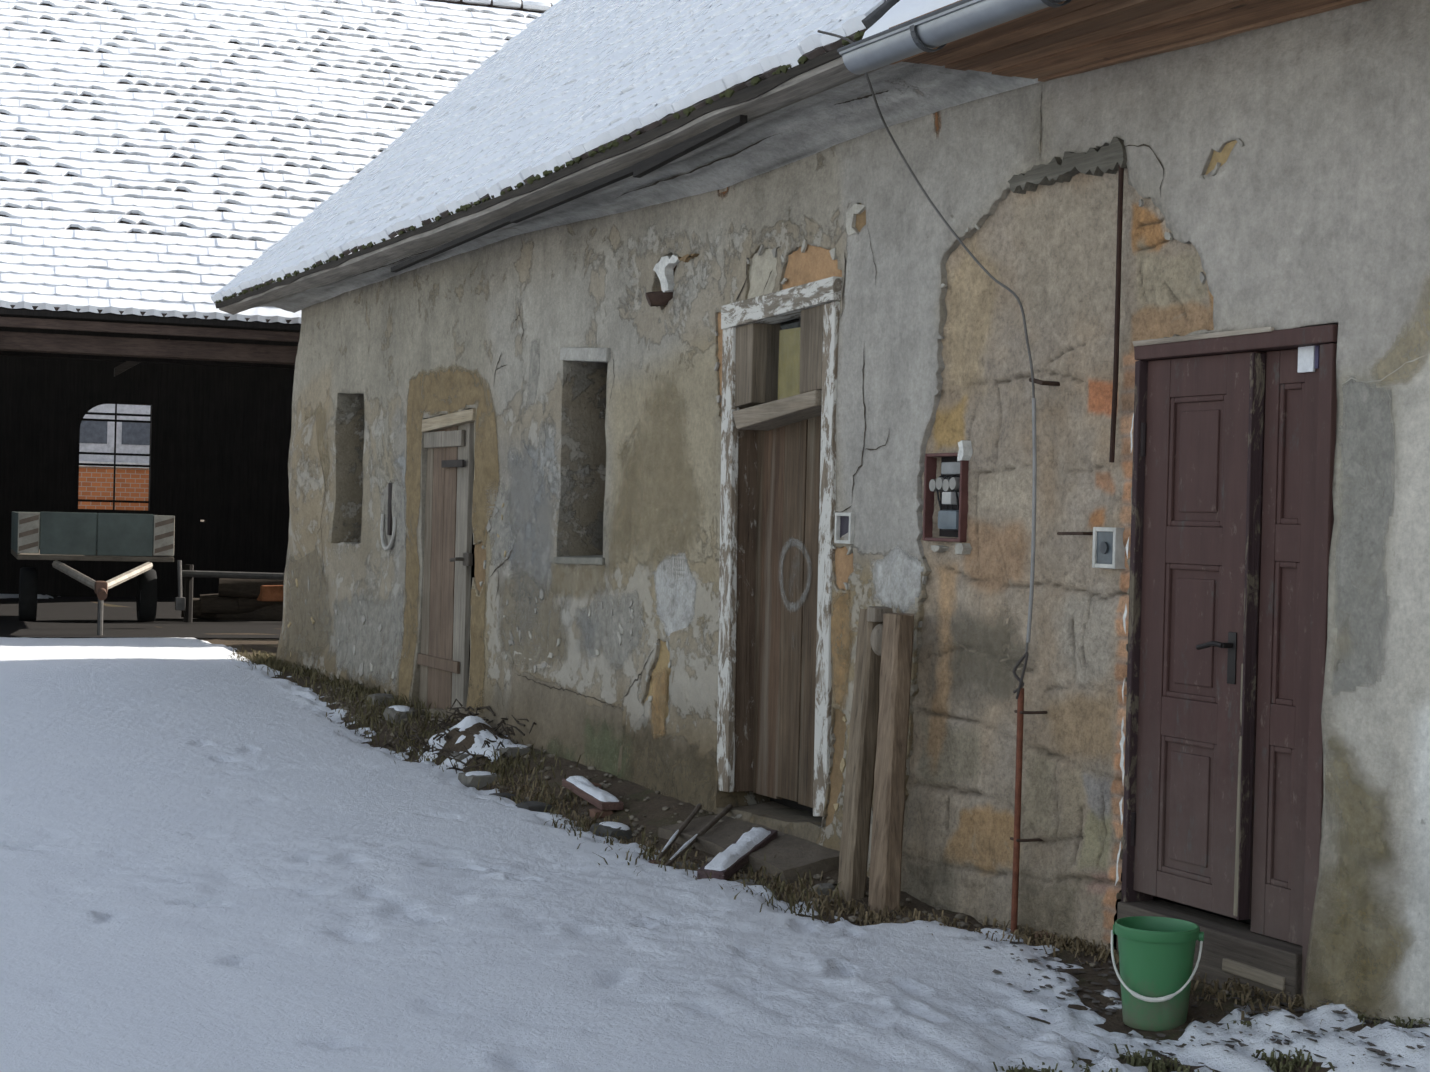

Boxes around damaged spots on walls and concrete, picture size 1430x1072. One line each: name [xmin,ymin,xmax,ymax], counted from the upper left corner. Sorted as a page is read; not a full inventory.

crack [1124,144,1164,197]
flaking render [1199,139,1245,179]
flaking render [846,203,866,236]
flaking render [747,239,842,299]
crack [839,232,876,320]
crack [842,352,890,512]
flaking render [901,137,1214,954]